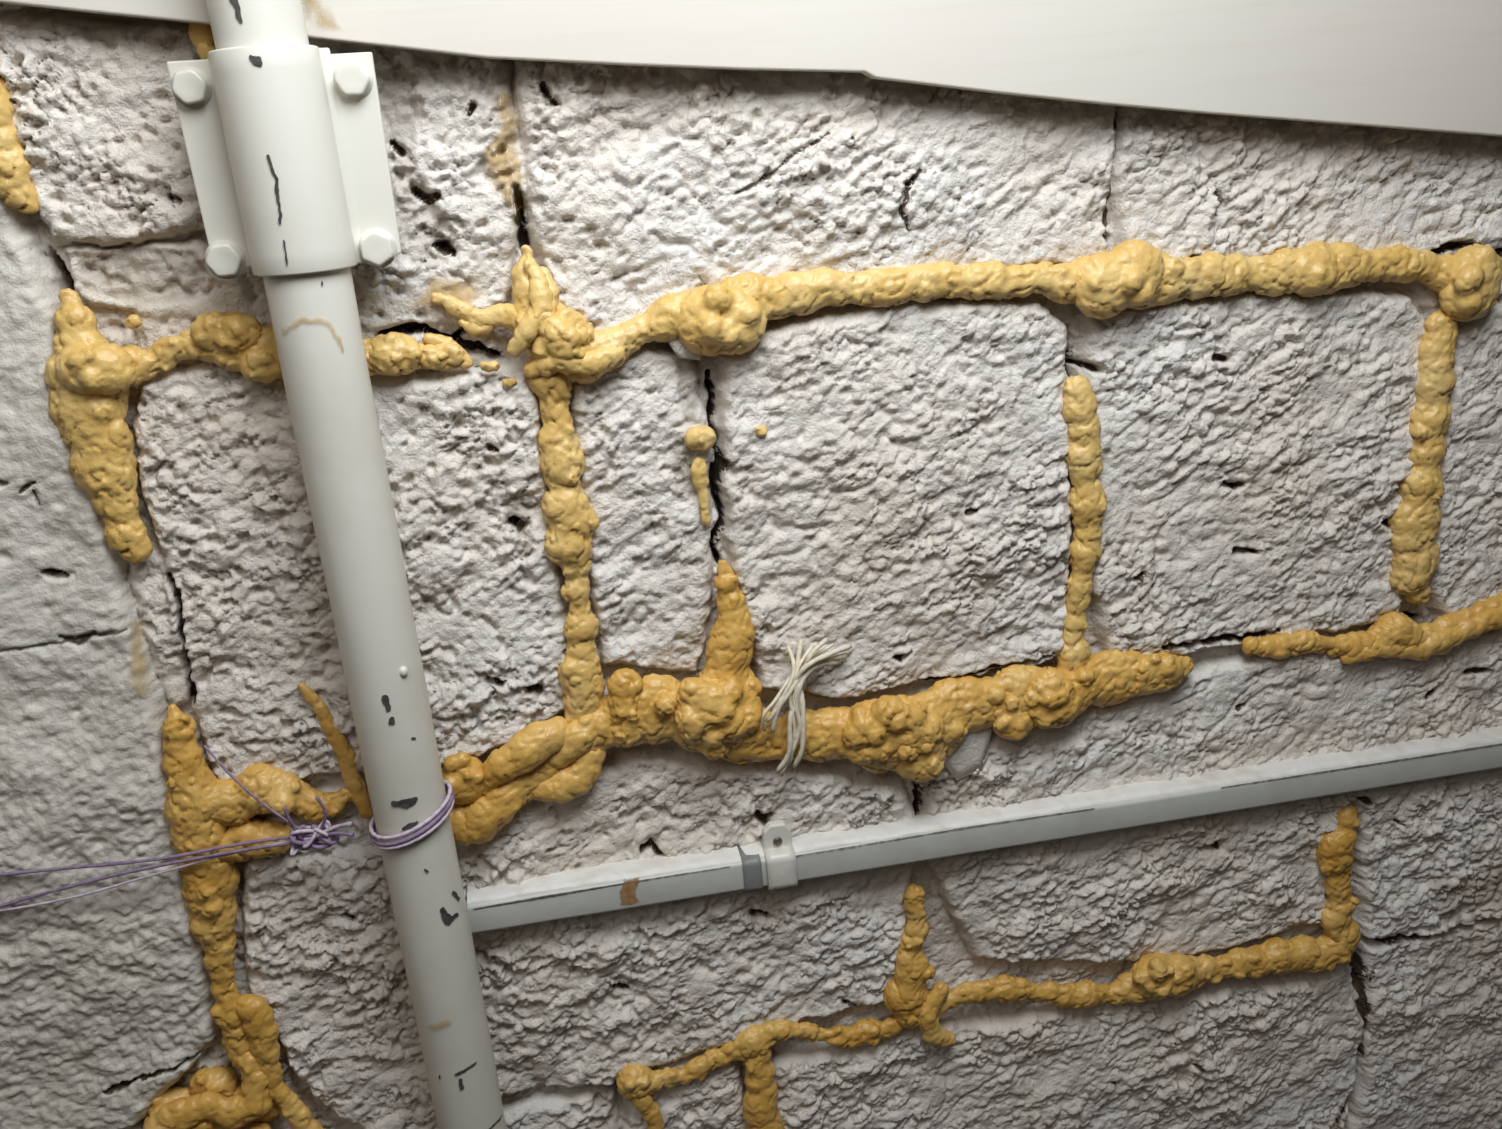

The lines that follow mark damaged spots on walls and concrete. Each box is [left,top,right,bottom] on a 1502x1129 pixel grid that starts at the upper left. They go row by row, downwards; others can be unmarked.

crack [1431,240,1502,254]
crack [704,369,732,564]
crack [168,572,197,705]
crack [1349,933,1430,1056]